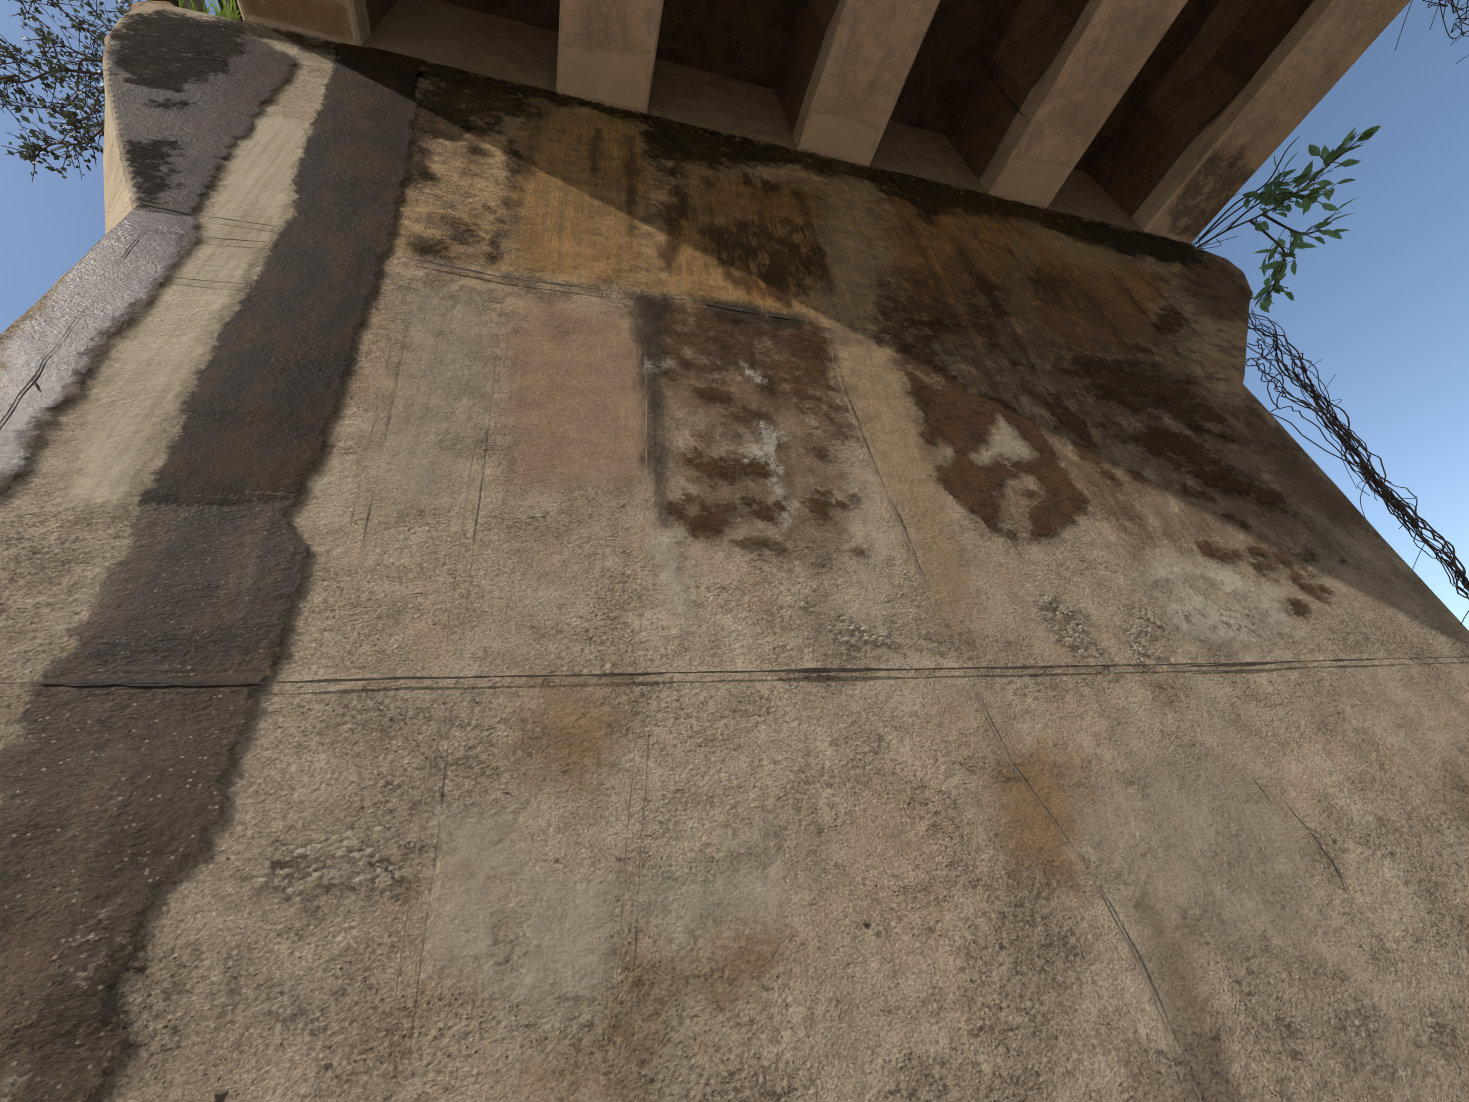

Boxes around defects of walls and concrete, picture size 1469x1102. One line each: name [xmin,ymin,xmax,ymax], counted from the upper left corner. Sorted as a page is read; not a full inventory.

crack [116,200,285,264]
leakage [0,9,1246,682]
crack [0,255,1469,1101]
leakage [1137,564,1288,644]
leakage [1241,411,1360,525]
leakage [0,683,260,1102]